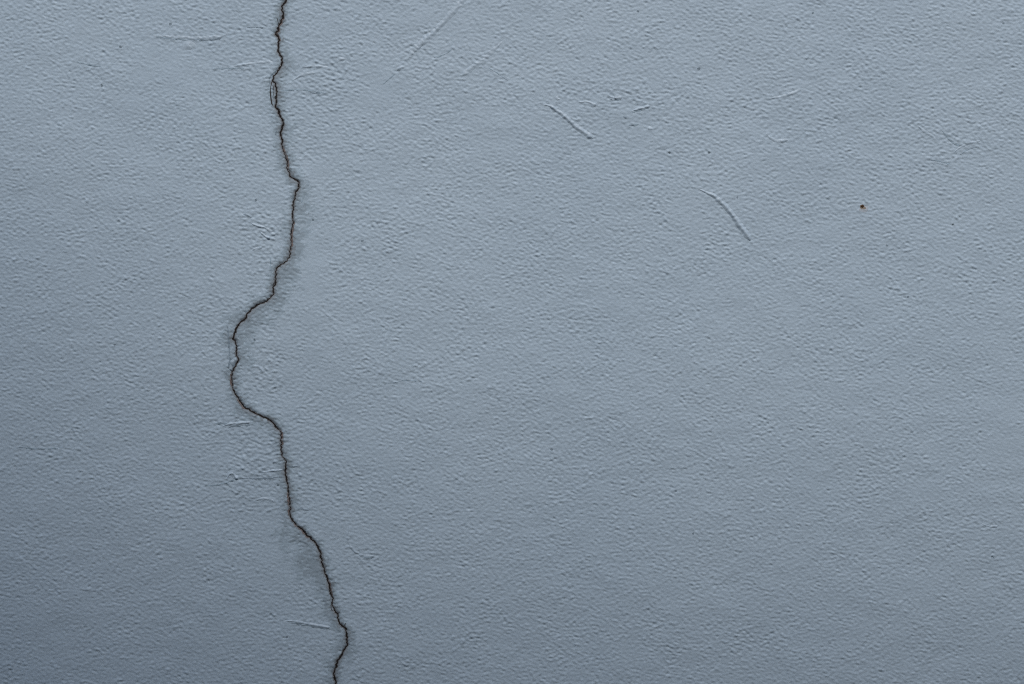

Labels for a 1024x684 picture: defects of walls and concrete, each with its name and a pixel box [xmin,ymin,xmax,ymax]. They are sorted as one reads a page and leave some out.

crack [205,0,349,684]